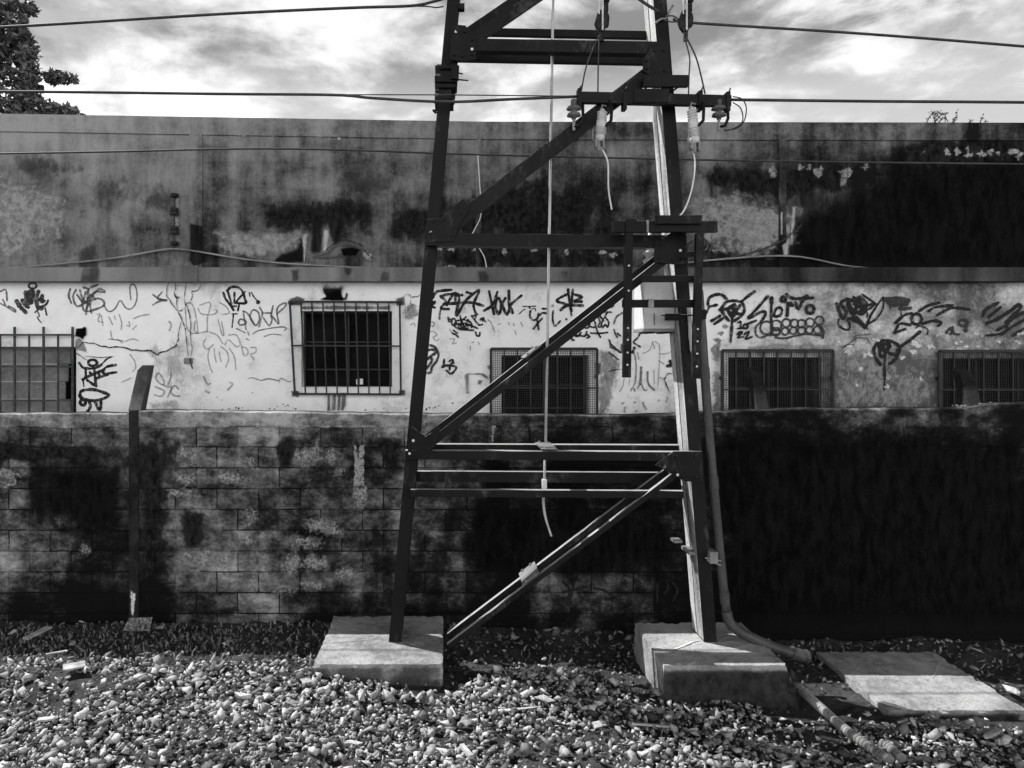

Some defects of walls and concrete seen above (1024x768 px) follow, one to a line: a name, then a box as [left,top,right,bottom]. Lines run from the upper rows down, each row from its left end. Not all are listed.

damp [79,246,99,281]
damp [189,223,204,265]
damp [390,209,428,242]
damp [443,248,624,282]
damp [462,177,621,235]
damp [697,140,1024,267]
crack [75,283,201,360]
damp [0,440,180,578]
damp [181,510,204,548]
damp [719,433,1024,615]